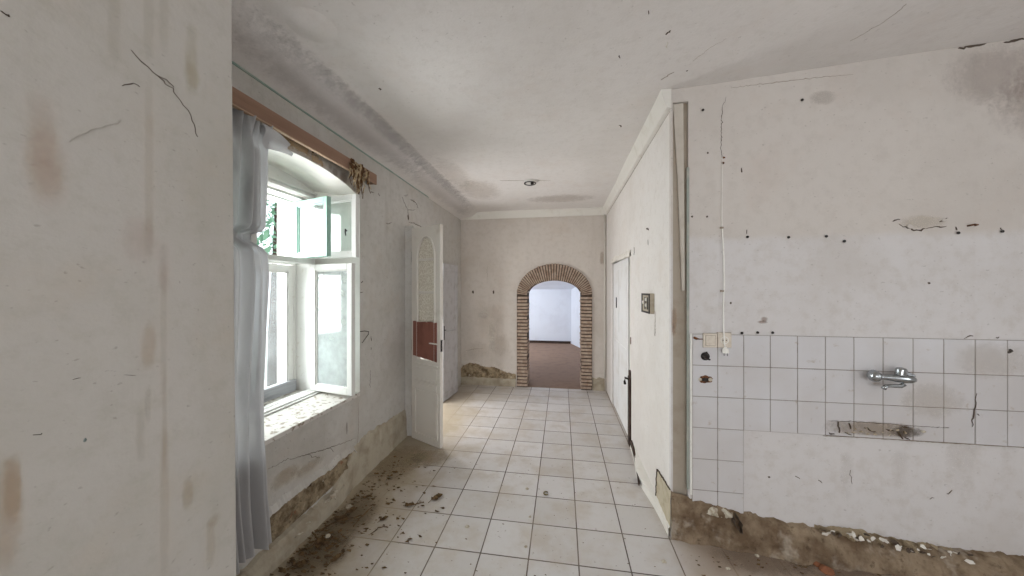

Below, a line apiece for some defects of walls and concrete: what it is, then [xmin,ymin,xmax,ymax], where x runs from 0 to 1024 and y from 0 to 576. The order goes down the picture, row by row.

crack [122,50,198,137]
flaking render [461,360,516,379]
flaking render [269,445,357,542]
flaking render [707,507,744,536]
flaking render [814,524,975,564]